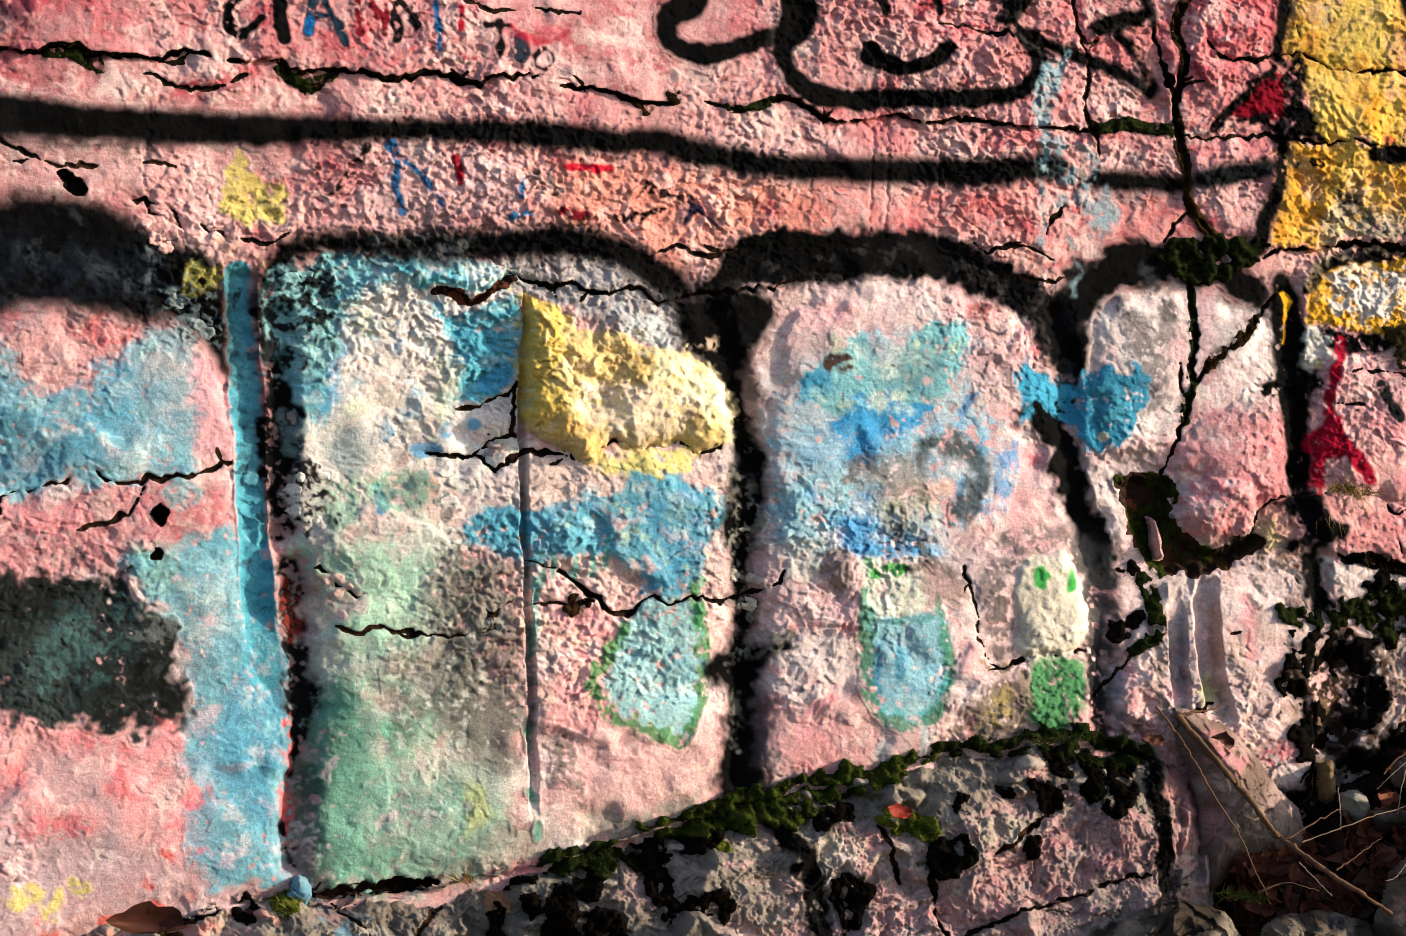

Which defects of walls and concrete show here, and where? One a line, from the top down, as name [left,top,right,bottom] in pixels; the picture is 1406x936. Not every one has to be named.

crack [0,0,1101,157]
crack [1151,5,1406,154]
crack [1163,195,1188,243]
crack [425,380,723,473]
crack [0,447,233,532]
crack [314,560,786,639]